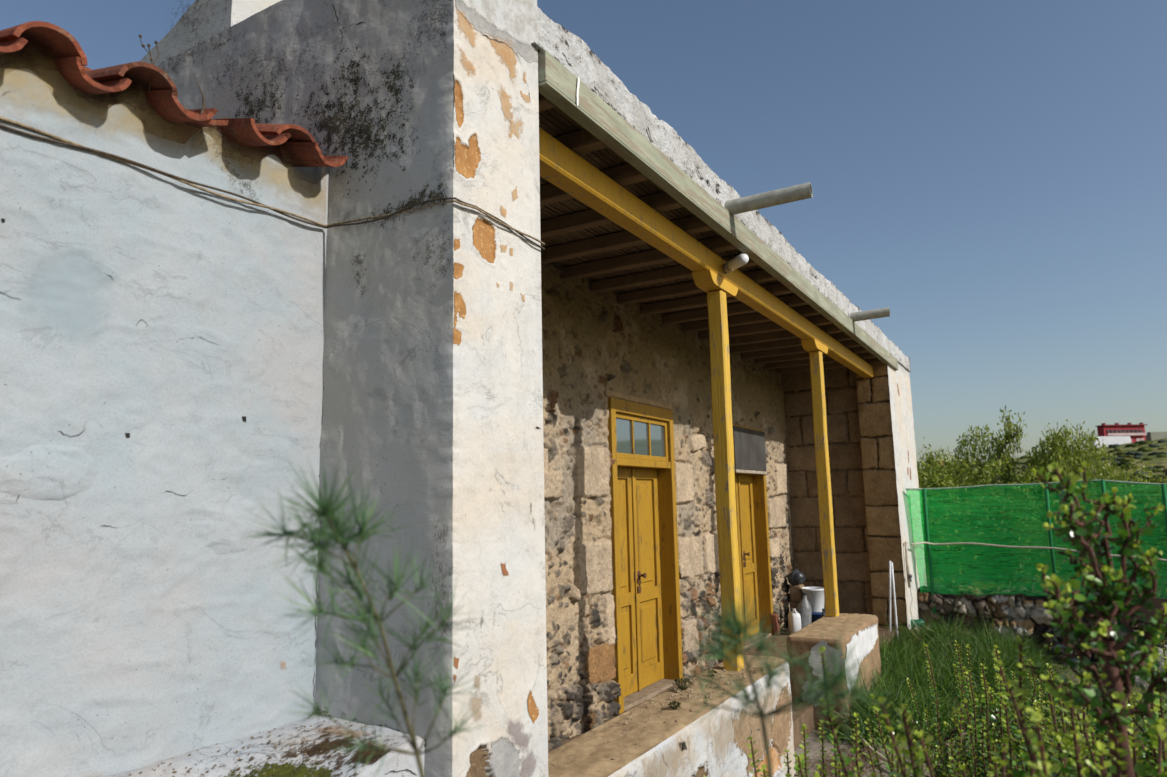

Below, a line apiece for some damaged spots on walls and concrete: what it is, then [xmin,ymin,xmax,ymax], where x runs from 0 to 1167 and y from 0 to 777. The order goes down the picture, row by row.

leakage [0,63,109,120]
leakage [122,99,177,138]
leakage [159,0,452,202]
peeling [454,0,538,179]
leakage [362,179,451,276]
peeling [453,186,518,345]
flaking render [732,624,878,777]
flaking render [466,737,521,777]
flaking render [691,761,709,777]